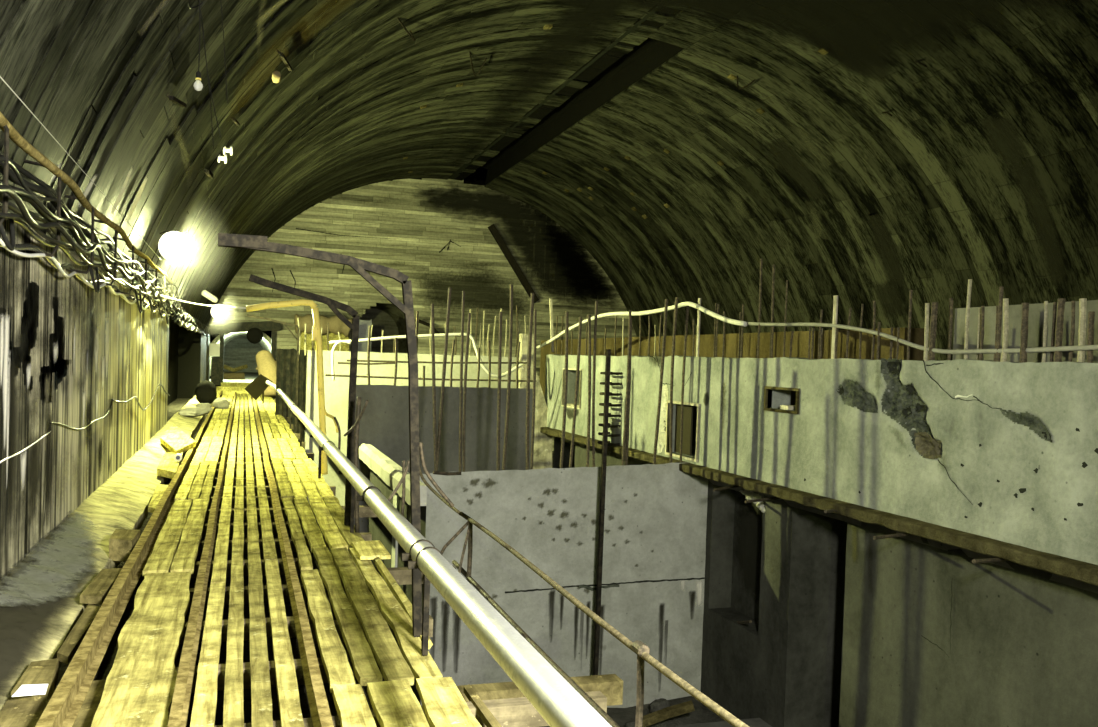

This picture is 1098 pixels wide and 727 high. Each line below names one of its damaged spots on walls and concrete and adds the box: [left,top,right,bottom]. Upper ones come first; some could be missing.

spalling [835,290,942,459]
crack [923,360,1002,409]
spalling [999,408,1052,443]